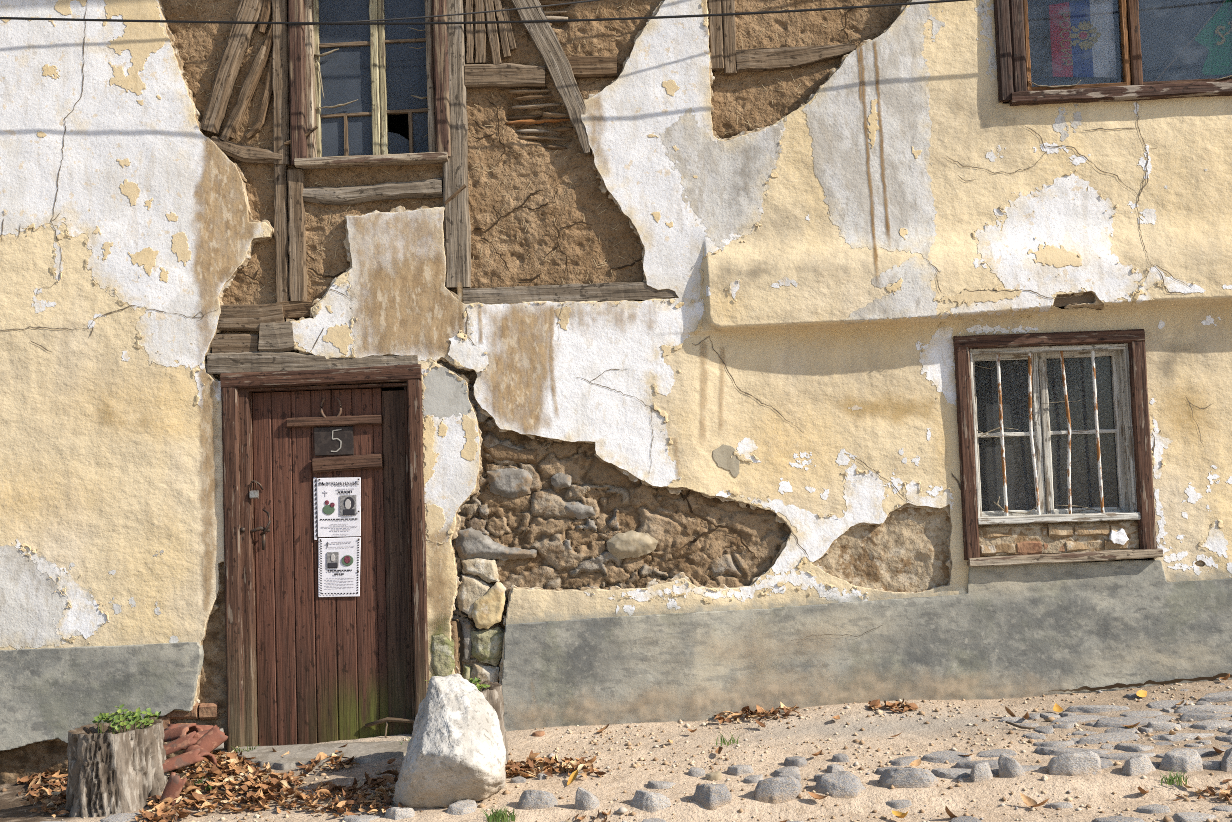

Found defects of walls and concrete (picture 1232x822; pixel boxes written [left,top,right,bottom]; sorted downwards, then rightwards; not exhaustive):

crack [0,0,87,297]
crack [0,305,215,352]
peeling [0,0,443,408]
crack [577,369,658,473]
flaking render [286,0,1206,685]
crack [692,336,802,432]
crack [925,258,1080,299]
crack [947,100,1191,294]
peeling [1150,398,1232,577]
peeling [0,539,136,650]